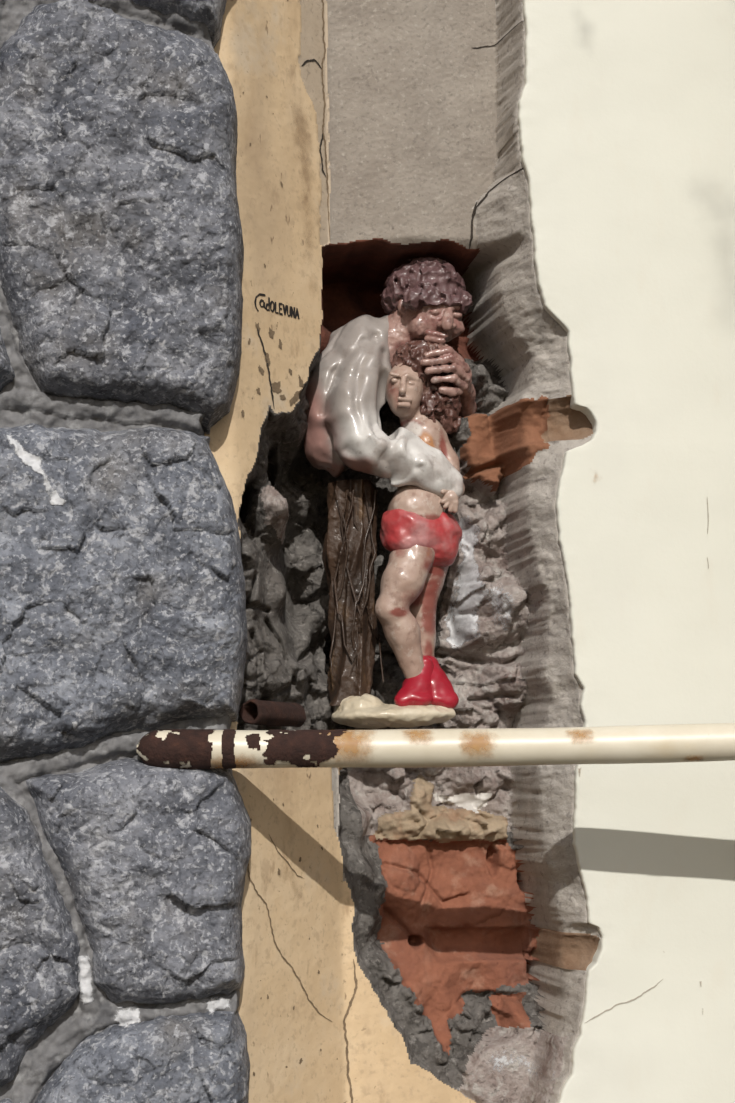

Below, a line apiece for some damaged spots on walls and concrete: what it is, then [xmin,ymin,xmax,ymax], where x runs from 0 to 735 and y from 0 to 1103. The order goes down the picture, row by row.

crack [302,0,330,236]
spalling [237,0,593,730]
rust [137,729,363,769]
crack [269,835,303,878]
crack [248,863,358,1103]
spalling [332,764,601,1103]
crack [585,979,663,1023]